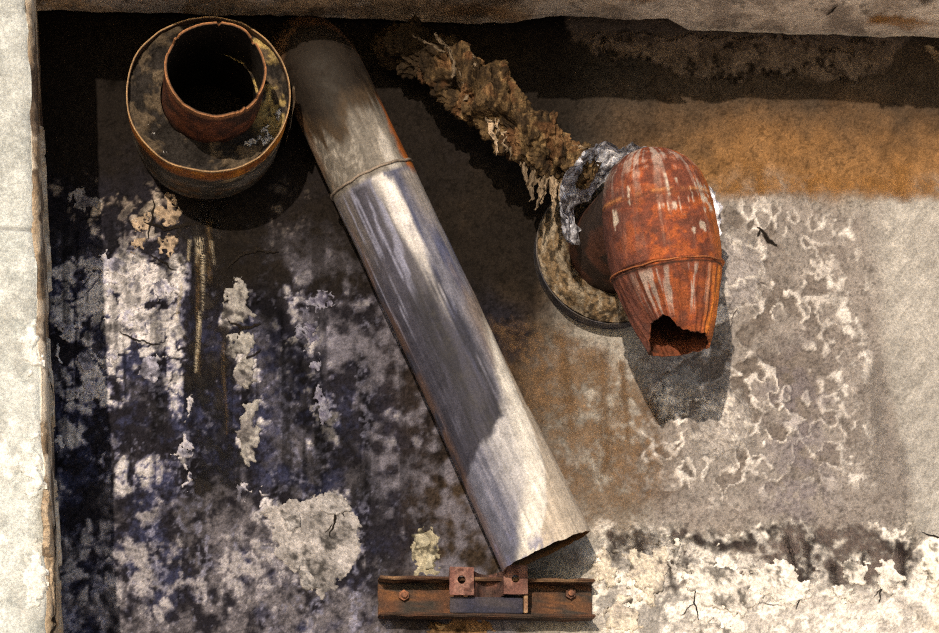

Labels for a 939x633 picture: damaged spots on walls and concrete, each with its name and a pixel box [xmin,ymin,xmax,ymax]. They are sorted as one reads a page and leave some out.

leakage [175,199,241,496]
crack [49,524,57,633]
peeling [918,538,939,593]